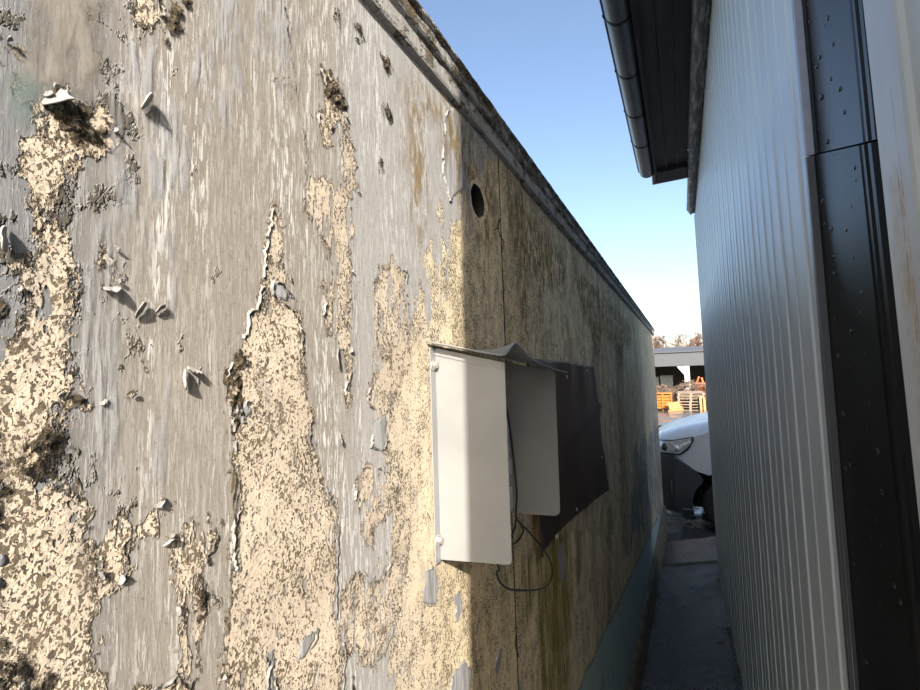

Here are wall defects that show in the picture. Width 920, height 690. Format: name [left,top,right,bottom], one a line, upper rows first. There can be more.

peeling [132,0,167,34]
peeling [4,35,26,60]
peeling [0,63,411,690]